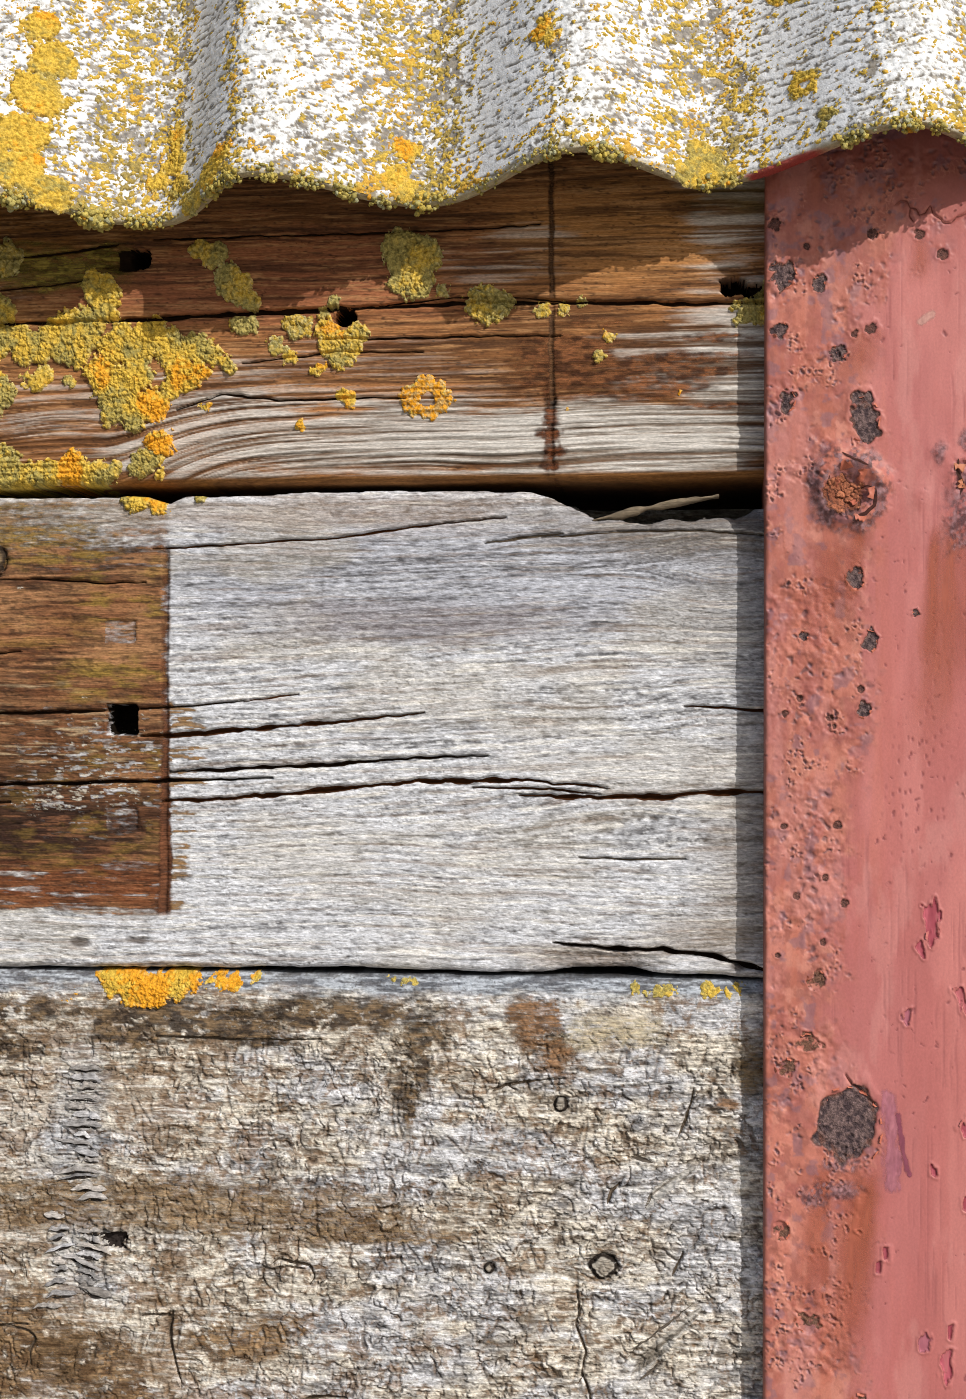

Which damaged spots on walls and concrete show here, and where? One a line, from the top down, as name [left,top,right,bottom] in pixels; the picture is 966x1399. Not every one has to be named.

rust [768,260,827,293]
rust [770,322,788,340]
rust [780,388,798,415]
rust [850,390,882,444]
rust [845,566,865,591]
rust [861,627,879,653]
rust [857,700,872,719]
crack [0,694,763,803]
peeling [915,897,942,959]
crack [554,942,763,971]
rust [802,1084,883,1207]
peeling [918,1325,953,1386]